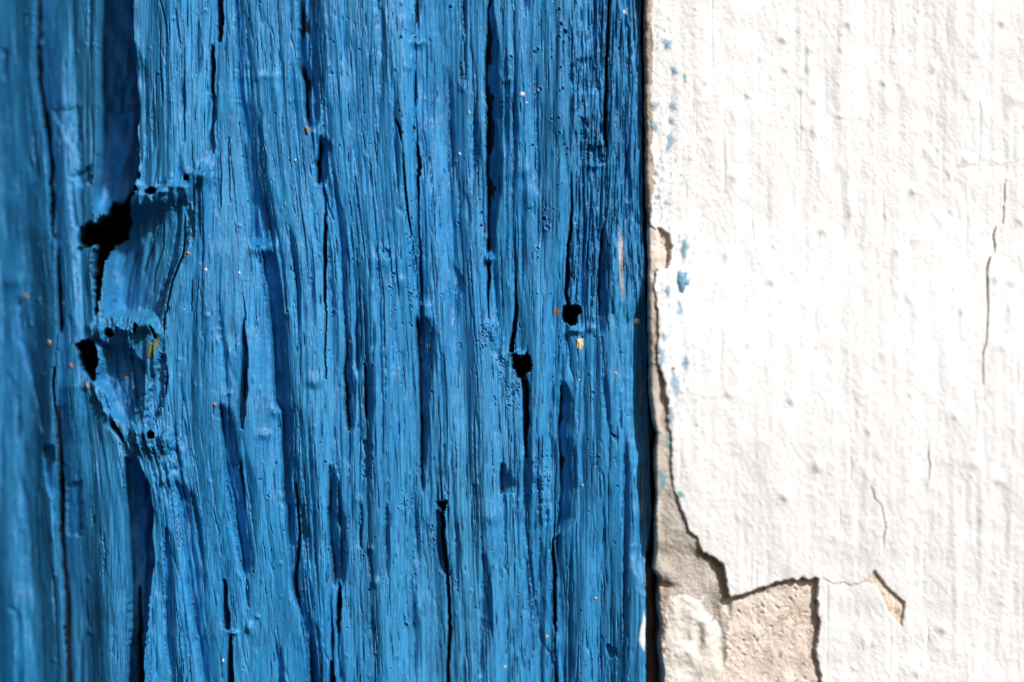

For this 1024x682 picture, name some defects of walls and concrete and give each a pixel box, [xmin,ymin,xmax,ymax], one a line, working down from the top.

spalling [634,0,822,682]
crack [955,159,1021,383]
peeling [863,571,905,627]